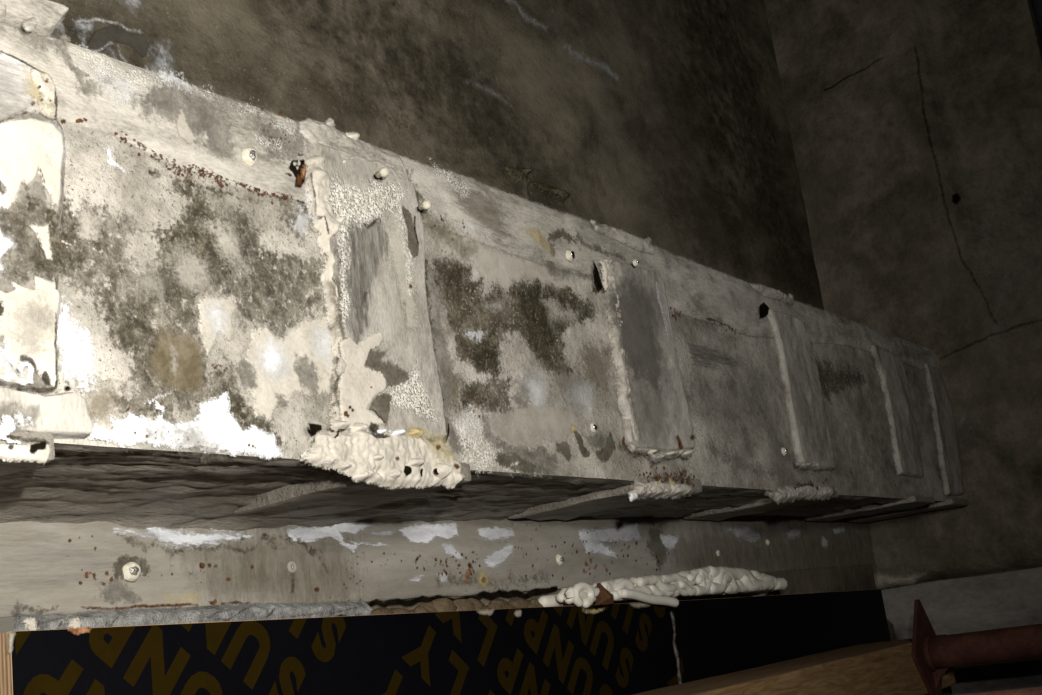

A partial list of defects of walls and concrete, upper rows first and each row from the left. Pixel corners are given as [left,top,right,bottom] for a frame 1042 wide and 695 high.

peeling [0,52,64,207]
corrosion [114,131,299,204]
peeling [0,231,13,270]
peeling [0,274,60,387]
leakage [0,158,625,476]
leakage [609,283,661,388]
spalling [0,434,50,463]
leakage [79,522,462,603]
leakage [478,527,515,568]